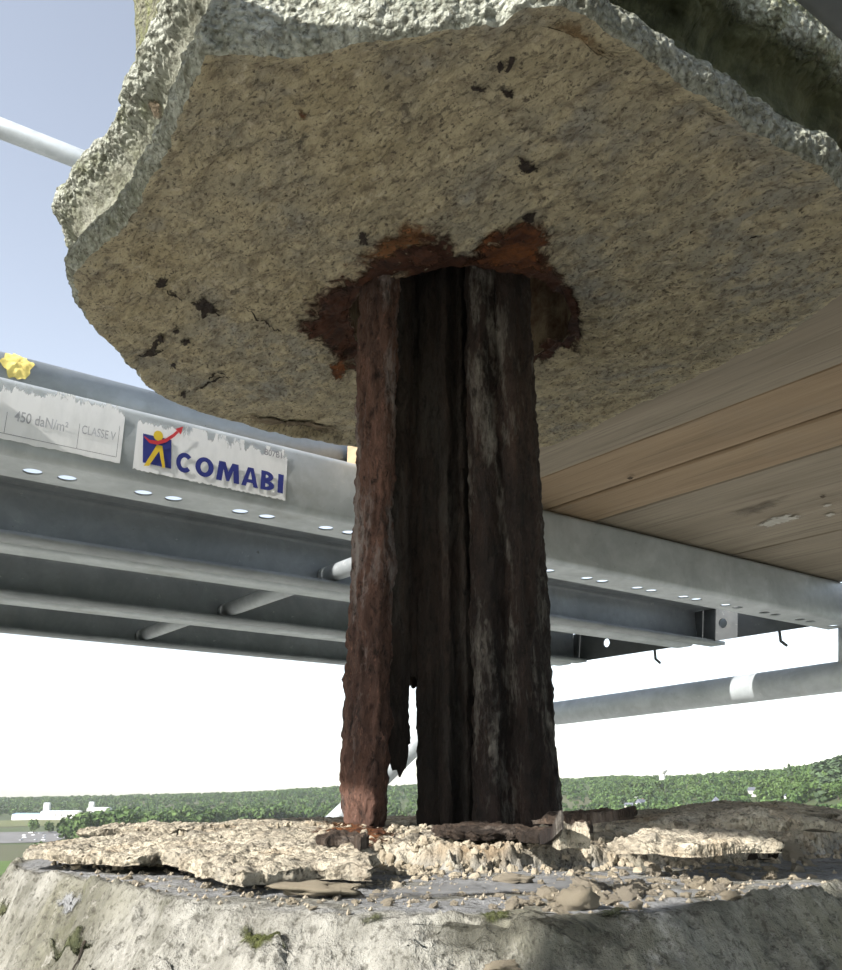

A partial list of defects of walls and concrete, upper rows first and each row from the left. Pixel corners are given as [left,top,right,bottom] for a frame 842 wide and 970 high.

corrosion [298,223,583,380]
spalling [552,821,591,850]